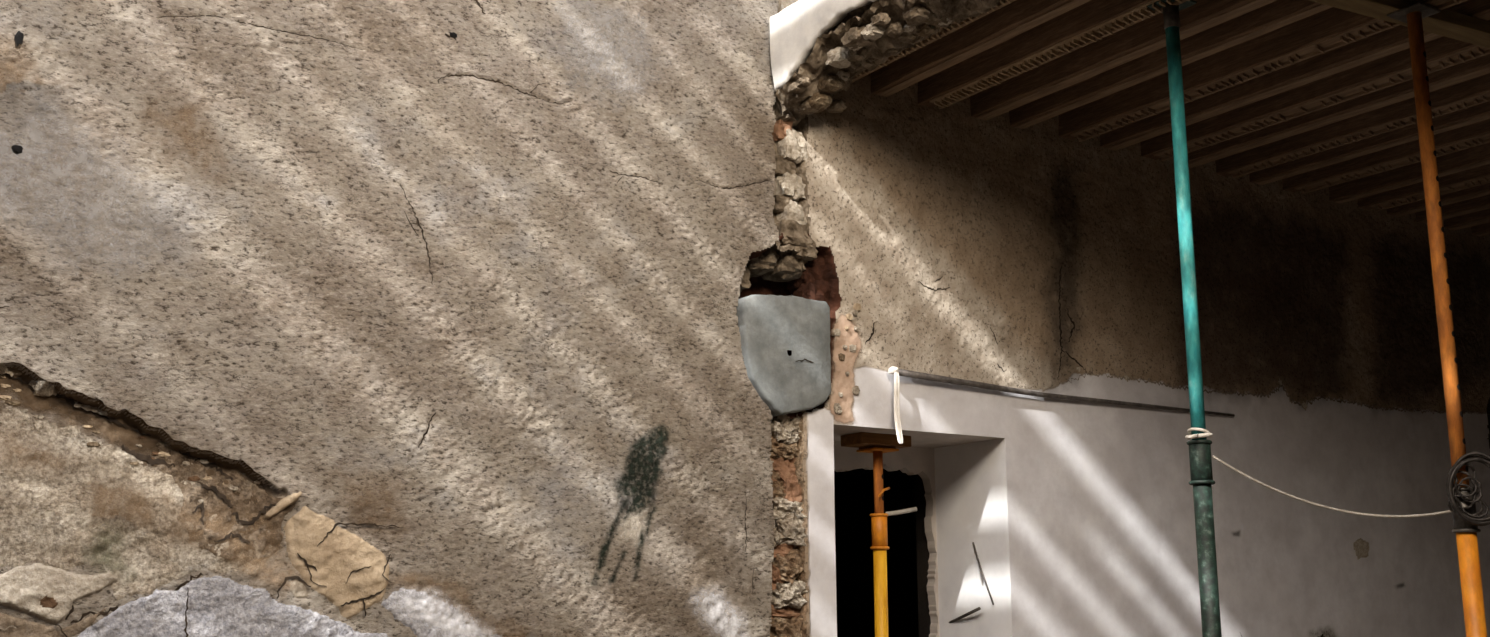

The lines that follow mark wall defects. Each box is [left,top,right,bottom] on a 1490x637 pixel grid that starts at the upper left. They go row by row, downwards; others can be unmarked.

crack [438,33,570,104]
peeling [0,362,403,637]
leakage [592,499,655,584]